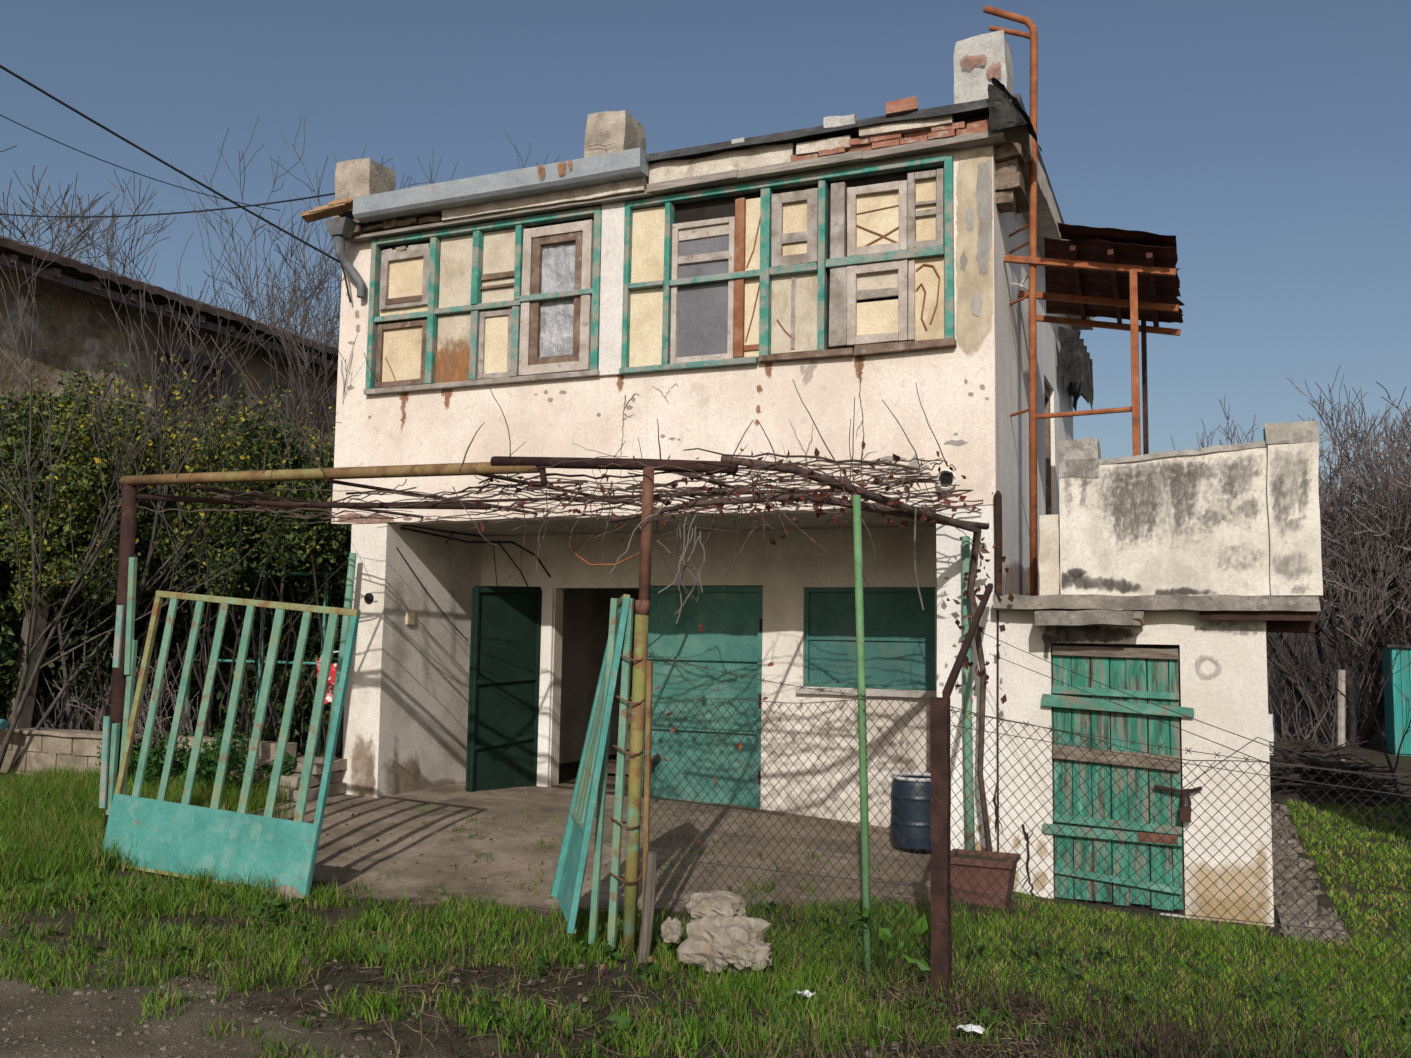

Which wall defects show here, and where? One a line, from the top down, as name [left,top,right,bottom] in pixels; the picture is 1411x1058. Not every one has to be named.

flaking render [790,119,996,162]
flaking render [956,153,993,353]
corrosion [400,392,408,424]
corrosion [755,362,773,425]
water stain [1103,458,1259,537]
water stain [1274,451,1308,526]
water stain [1062,568,1209,595]
water stain [351,739,453,797]
water stain [1195,851,1268,926]